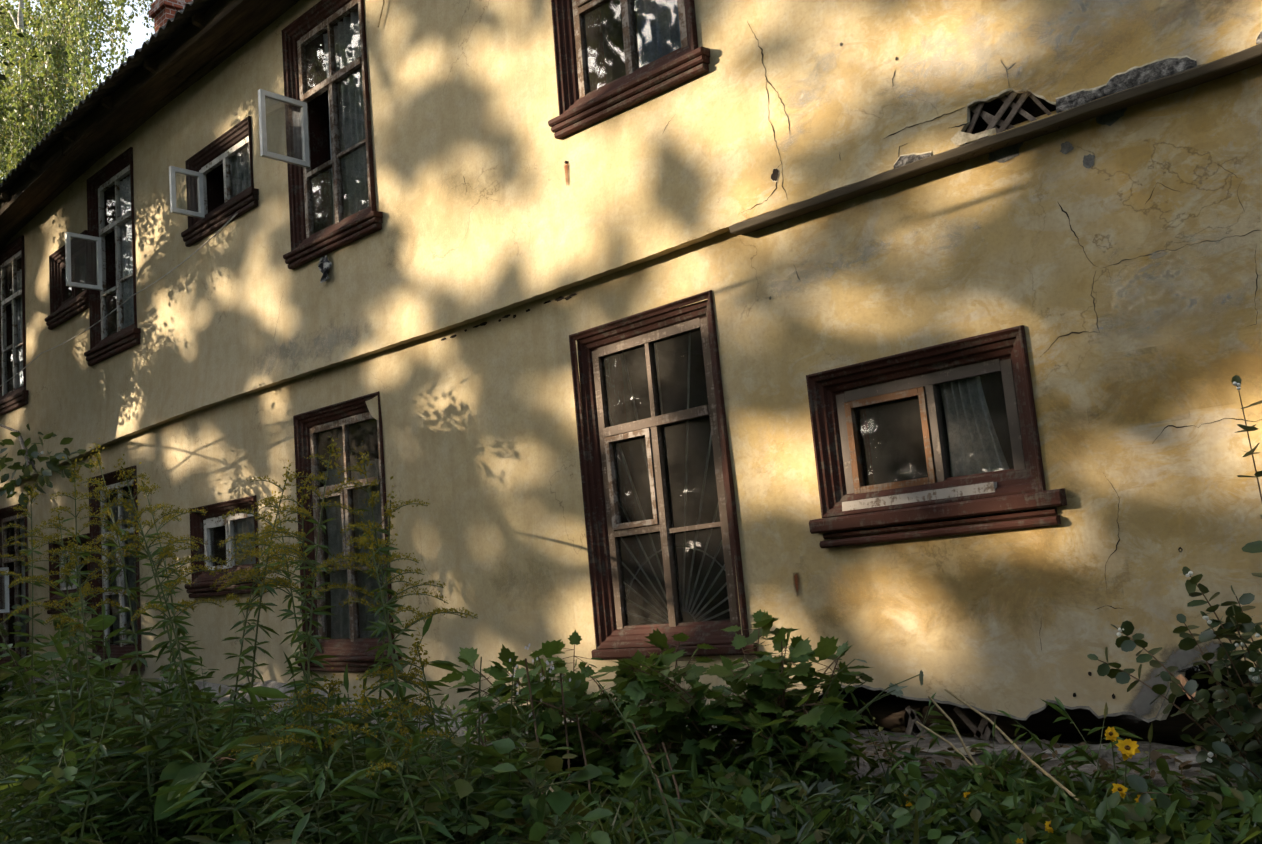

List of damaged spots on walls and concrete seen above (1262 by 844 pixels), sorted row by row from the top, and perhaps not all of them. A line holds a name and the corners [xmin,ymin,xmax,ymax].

crack [741,21,790,213]
spalling [893,151,932,169]
crack [885,107,969,158]
spalling [950,55,1197,163]
peeling [1060,141,1095,168]
crack [1049,162,1262,348]
crack [1095,476,1123,610]
spalling [841,639,1227,744]